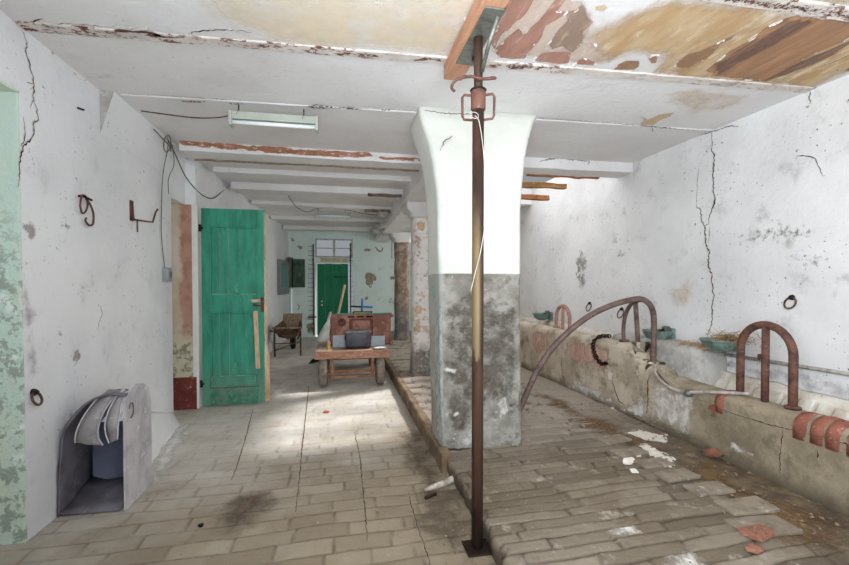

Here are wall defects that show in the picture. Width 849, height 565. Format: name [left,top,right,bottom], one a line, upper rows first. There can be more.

peeling [109,25,186,38]
peeling [491,0,609,66]
peeling [612,54,660,70]
peeling [674,16,849,82]
crack [15,18,163,187]
crack [290,105,472,115]
crack [795,155,825,176]
crack [537,117,739,336]
crack [697,398,846,473]
leakage [226,493,273,524]
crack [354,432,368,541]
crack [407,491,430,565]